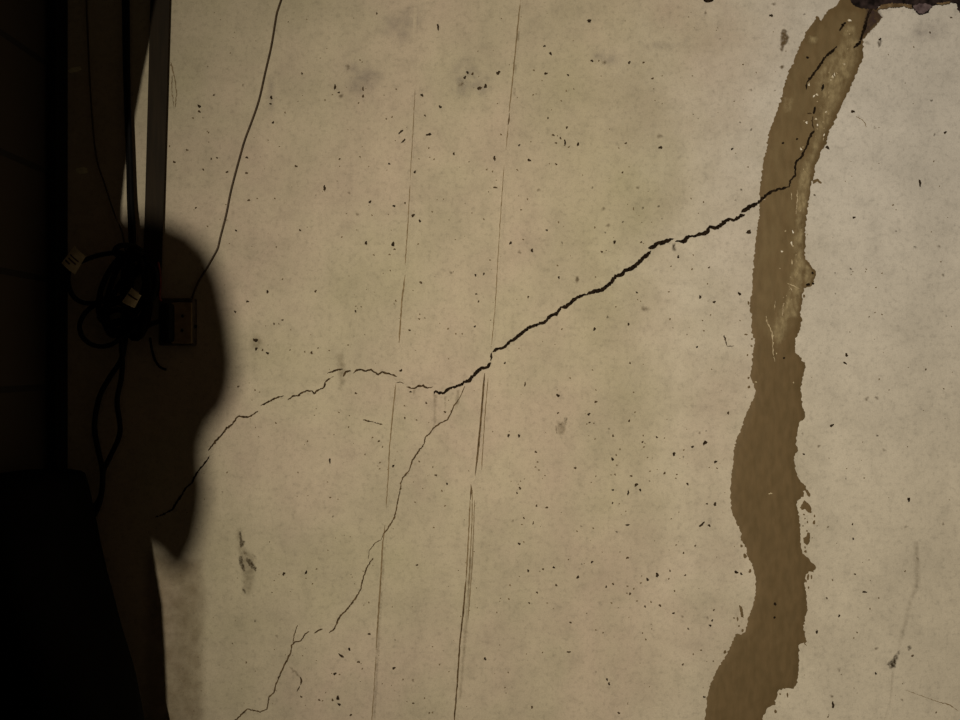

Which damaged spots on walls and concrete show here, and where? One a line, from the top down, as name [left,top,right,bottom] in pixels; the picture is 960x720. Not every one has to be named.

crack [156,8,872,720]
leakage [864,9,881,33]